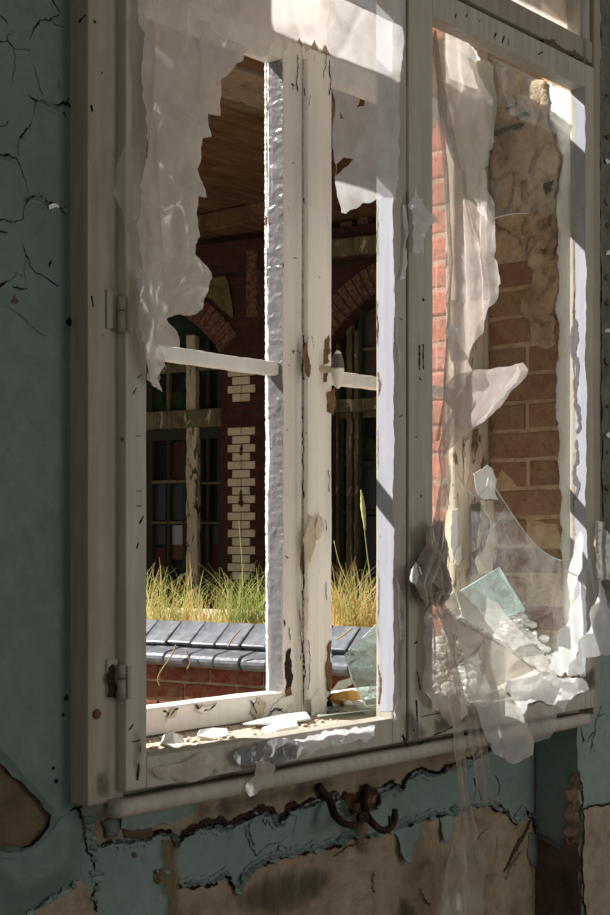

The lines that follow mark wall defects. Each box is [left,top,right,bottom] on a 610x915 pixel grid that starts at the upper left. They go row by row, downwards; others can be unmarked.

crack [0,0,71,336]
peeling [302,338,311,378]
peeling [323,336,336,415]
peeling [300,512,324,575]
peeling [250,648,298,732]
spalling [0,748,58,859]
spalling [94,745,610,915]